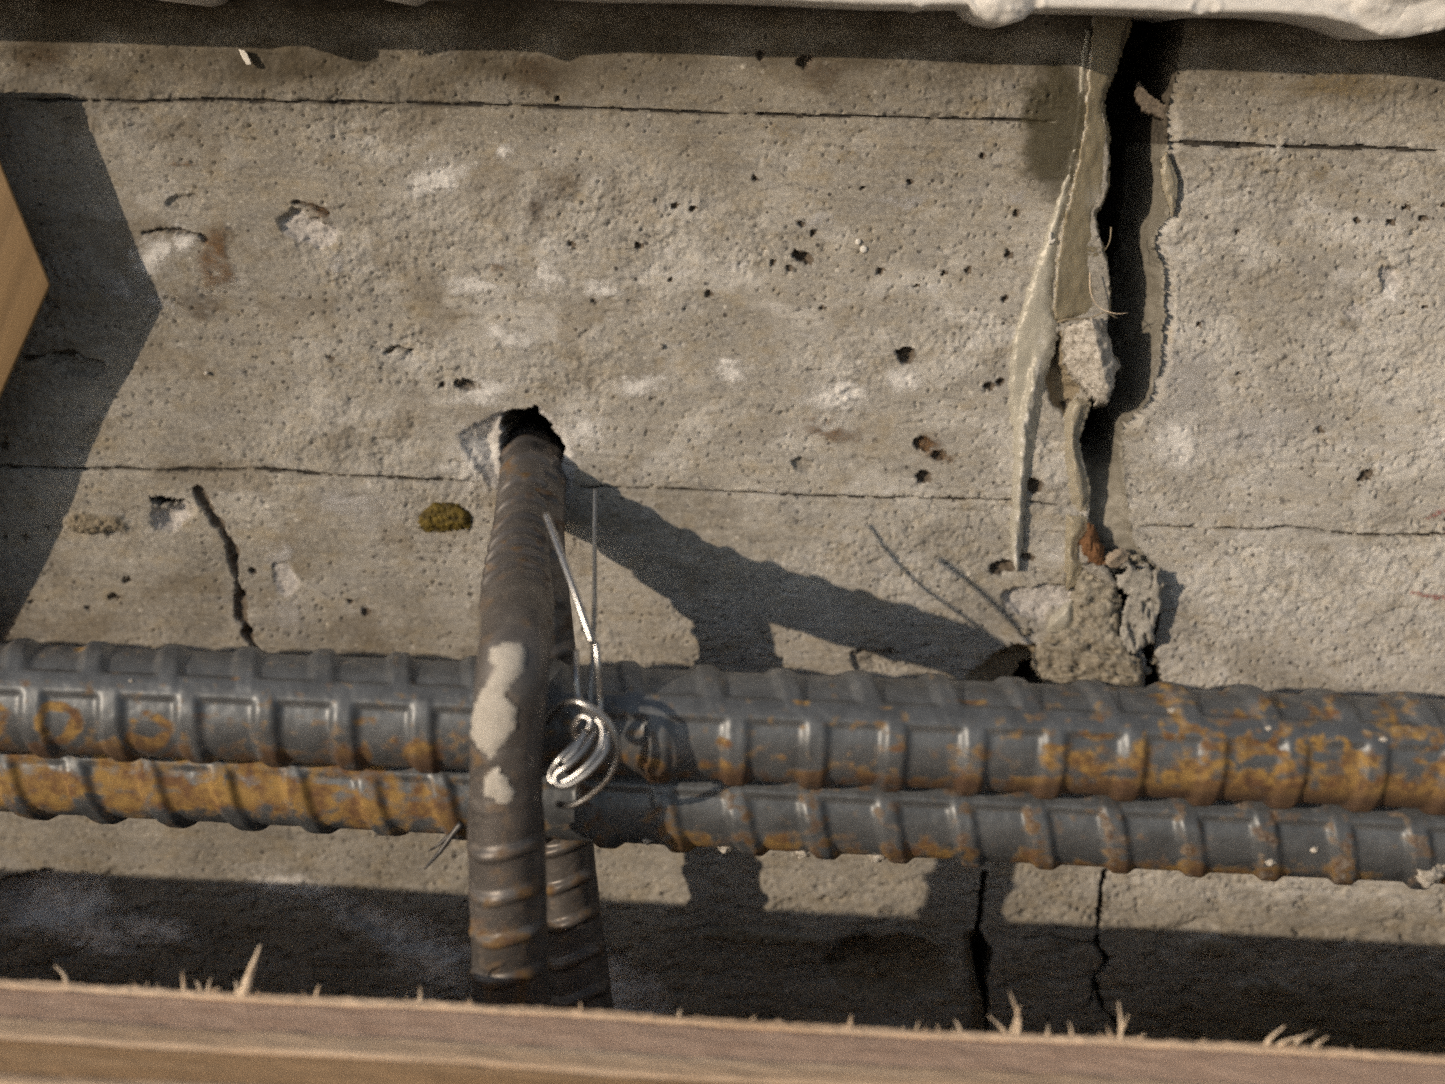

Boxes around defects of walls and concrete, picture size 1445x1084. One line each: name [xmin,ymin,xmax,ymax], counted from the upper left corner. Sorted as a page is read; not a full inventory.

spalling [275,206,344,251]
crack [1045,18,1186,686]
spalling [143,494,199,534]
crack [193,483,260,649]
spalling [271,559,302,599]
spalling [457,407,509,488]
spalling [539,406,576,503]
spalling [0,638,477,841]
spalling [543,548,1445,890]
spalling [0,866,122,932]
crack [964,870,994,1032]
crack [1030,868,1130,1037]